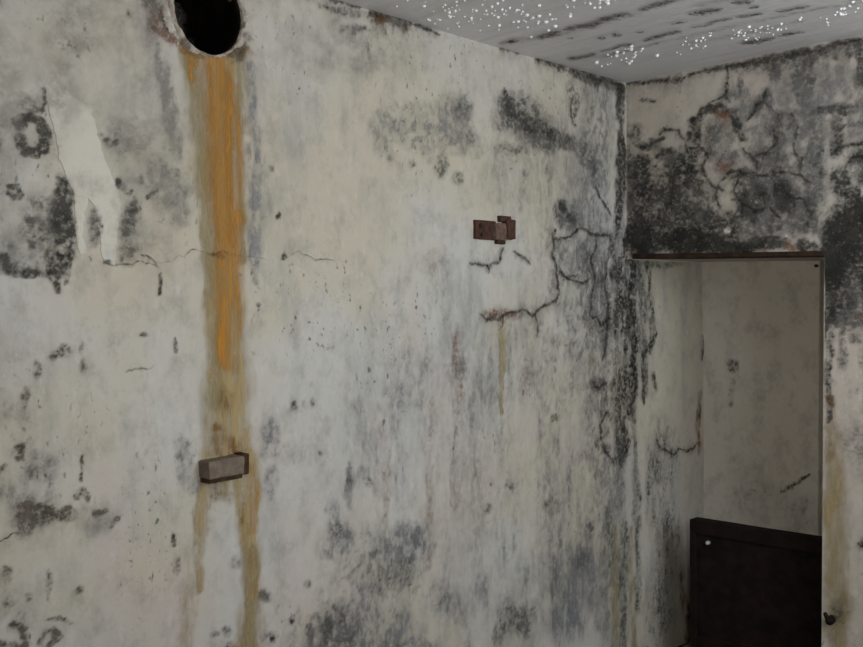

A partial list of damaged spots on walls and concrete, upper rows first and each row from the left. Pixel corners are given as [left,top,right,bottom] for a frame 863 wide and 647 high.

leakage [0,88,52,159]
leakage [155,43,176,139]
leakage [382,99,474,144]
crack [659,91,812,225]
crack [835,142,863,168]
leakage [0,176,76,293]
leakage [121,204,139,261]
corrosion [152,7,260,647]
crack [483,187,611,360]
leakage [495,37,863,647]
leakage [307,526,426,647]